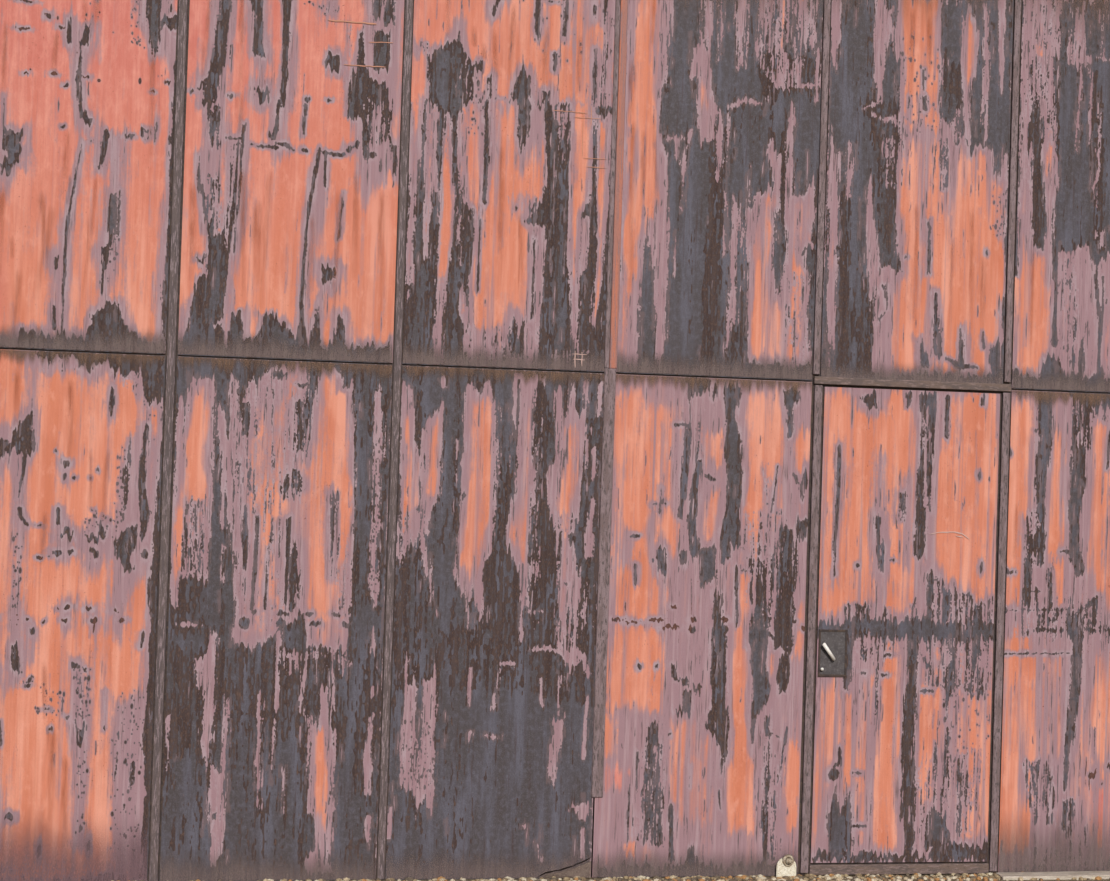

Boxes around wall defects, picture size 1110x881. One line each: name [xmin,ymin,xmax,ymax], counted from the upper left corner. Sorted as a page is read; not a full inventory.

peeling [0,103,23,177]
peeling [0,398,42,608]
peeling [11,0,623,881]
peeling [614,0,1110,864]